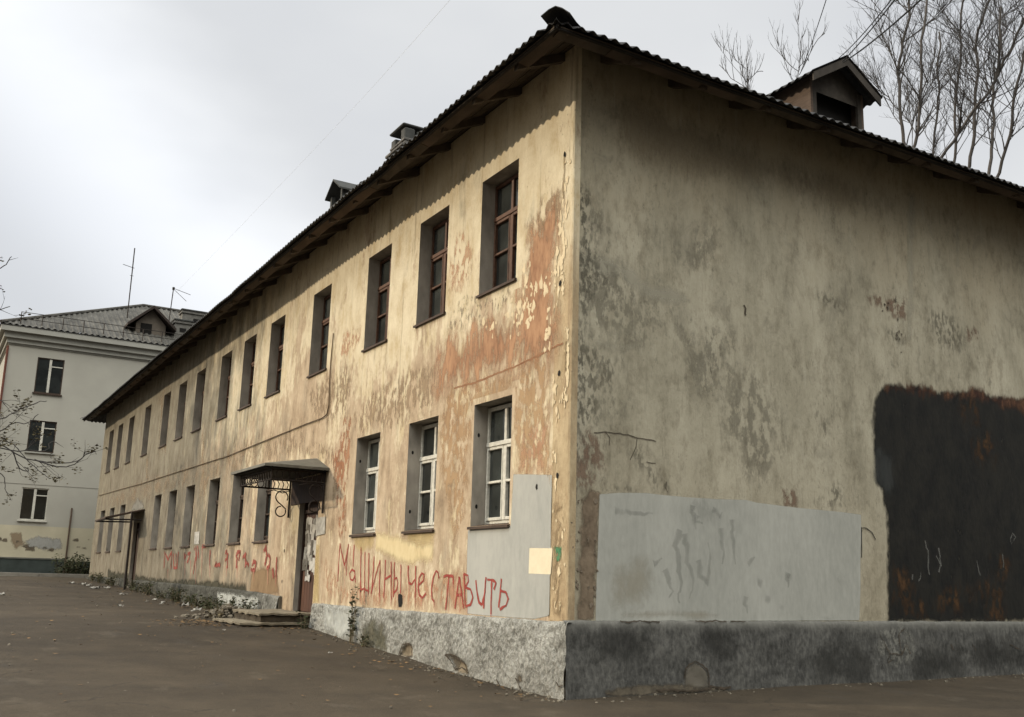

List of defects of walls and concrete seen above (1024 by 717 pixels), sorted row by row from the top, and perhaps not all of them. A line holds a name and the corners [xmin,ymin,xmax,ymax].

peeling [436,156,571,421]
crack [594,431,667,490]
peeling [0,533,85,551]